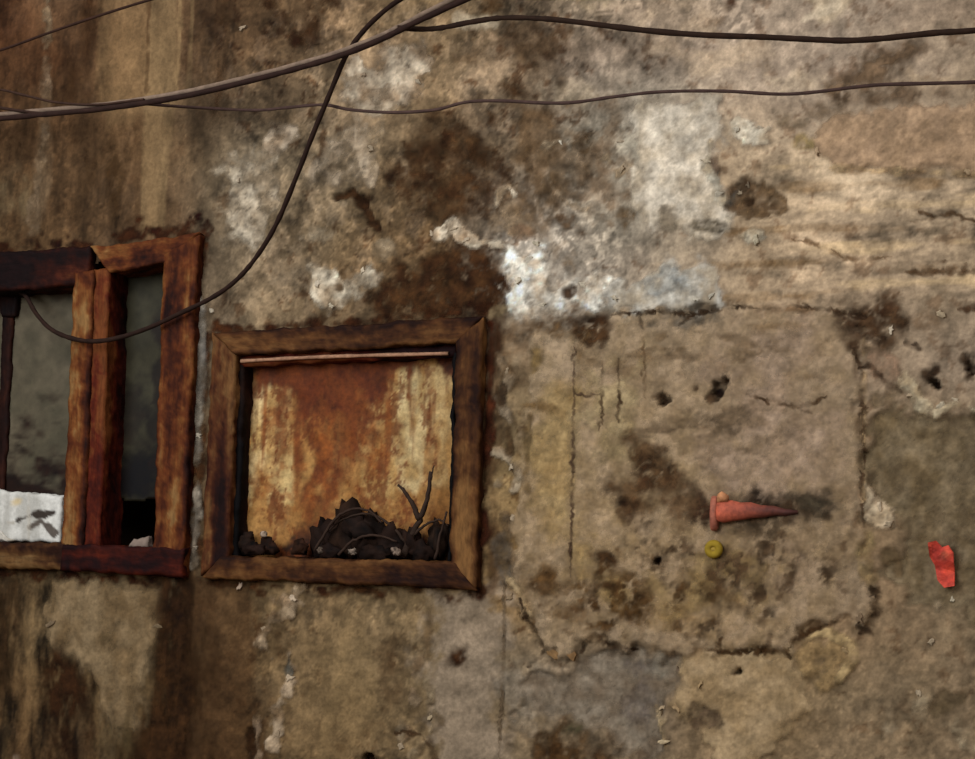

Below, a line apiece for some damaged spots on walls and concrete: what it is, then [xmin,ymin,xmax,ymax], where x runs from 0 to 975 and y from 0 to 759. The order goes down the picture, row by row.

water stain [384,111,513,220]
rust [112,213,214,262]
rust [200,319,253,401]
rust [334,241,513,468]
rust [245,358,453,558]
water stain [42,649,94,759]
water stain [136,576,201,759]
crack [496,689,504,759]
crack [501,580,545,668]
crack [568,641,639,661]
flaking render [509,628,858,759]
crack [708,624,828,660]